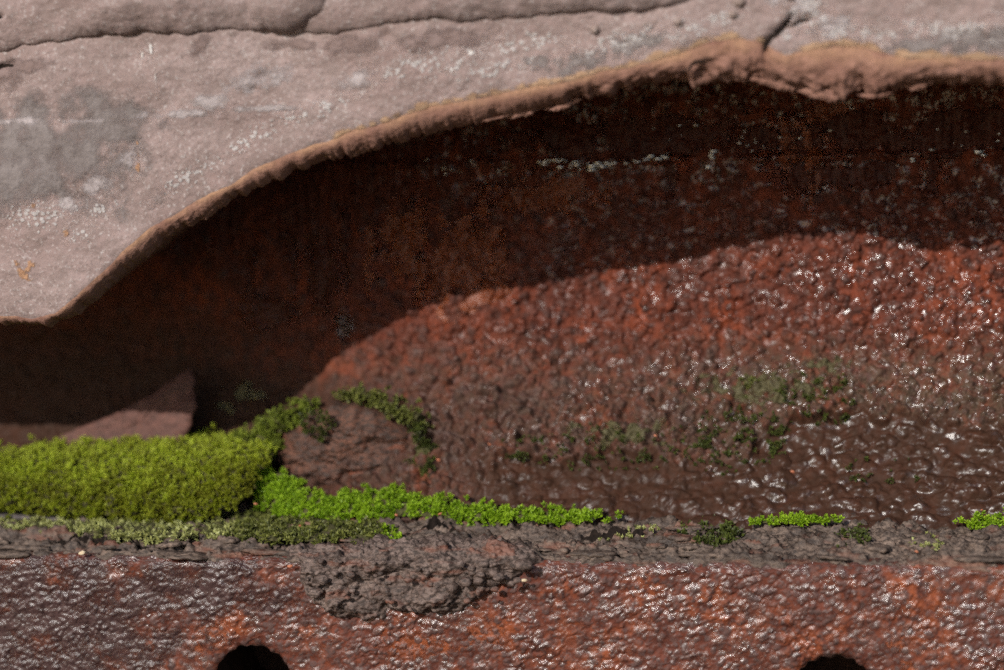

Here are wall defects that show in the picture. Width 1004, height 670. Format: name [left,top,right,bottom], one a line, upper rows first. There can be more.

rust [334,31,743,138]
crack [683,57,712,73]
crack [749,16,810,61]
rust [800,38,1004,60]
rust [771,99,848,207]
rust [363,172,615,335]
rust [47,368,197,447]